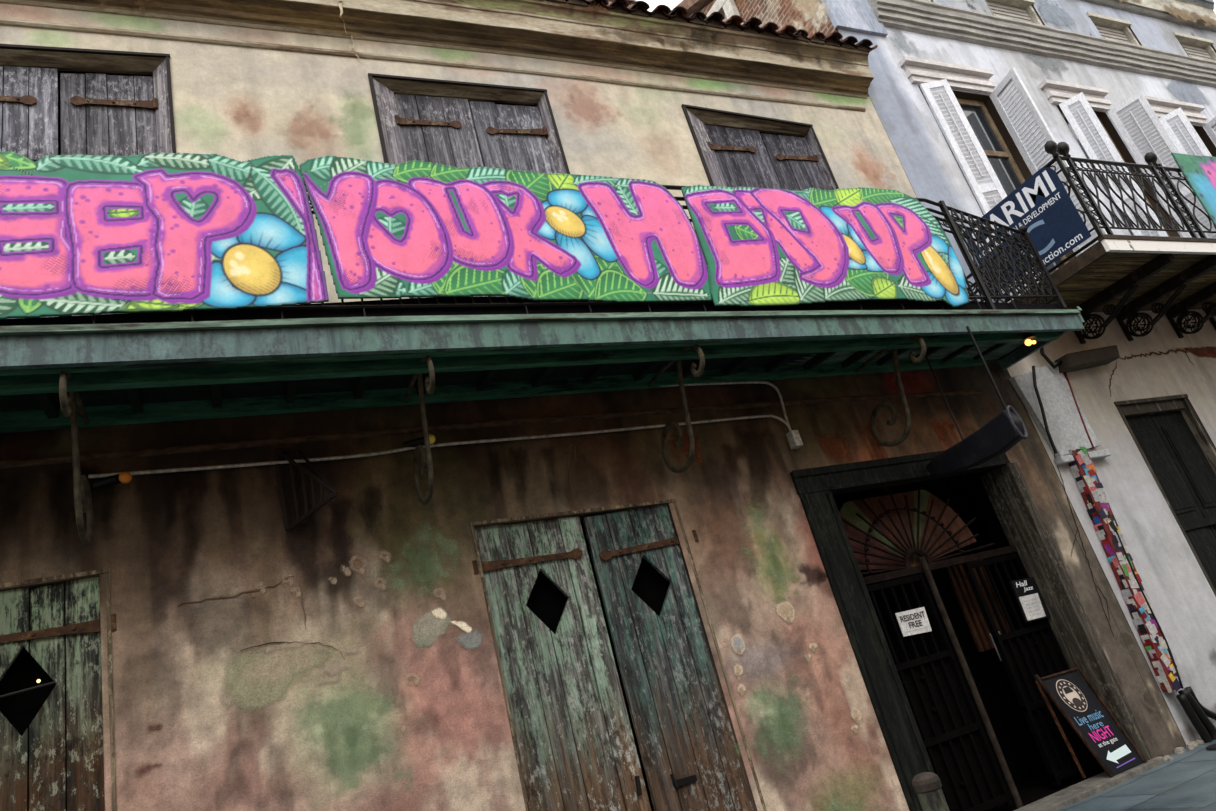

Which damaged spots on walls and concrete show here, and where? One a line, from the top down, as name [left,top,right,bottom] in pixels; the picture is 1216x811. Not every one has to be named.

flaking render [792,0,827,29]
leakage [166,470,206,544]
leakage [289,499,350,576]
leakage [800,565,827,585]
flaking render [413,590,482,649]
flaking render [221,639,357,708]